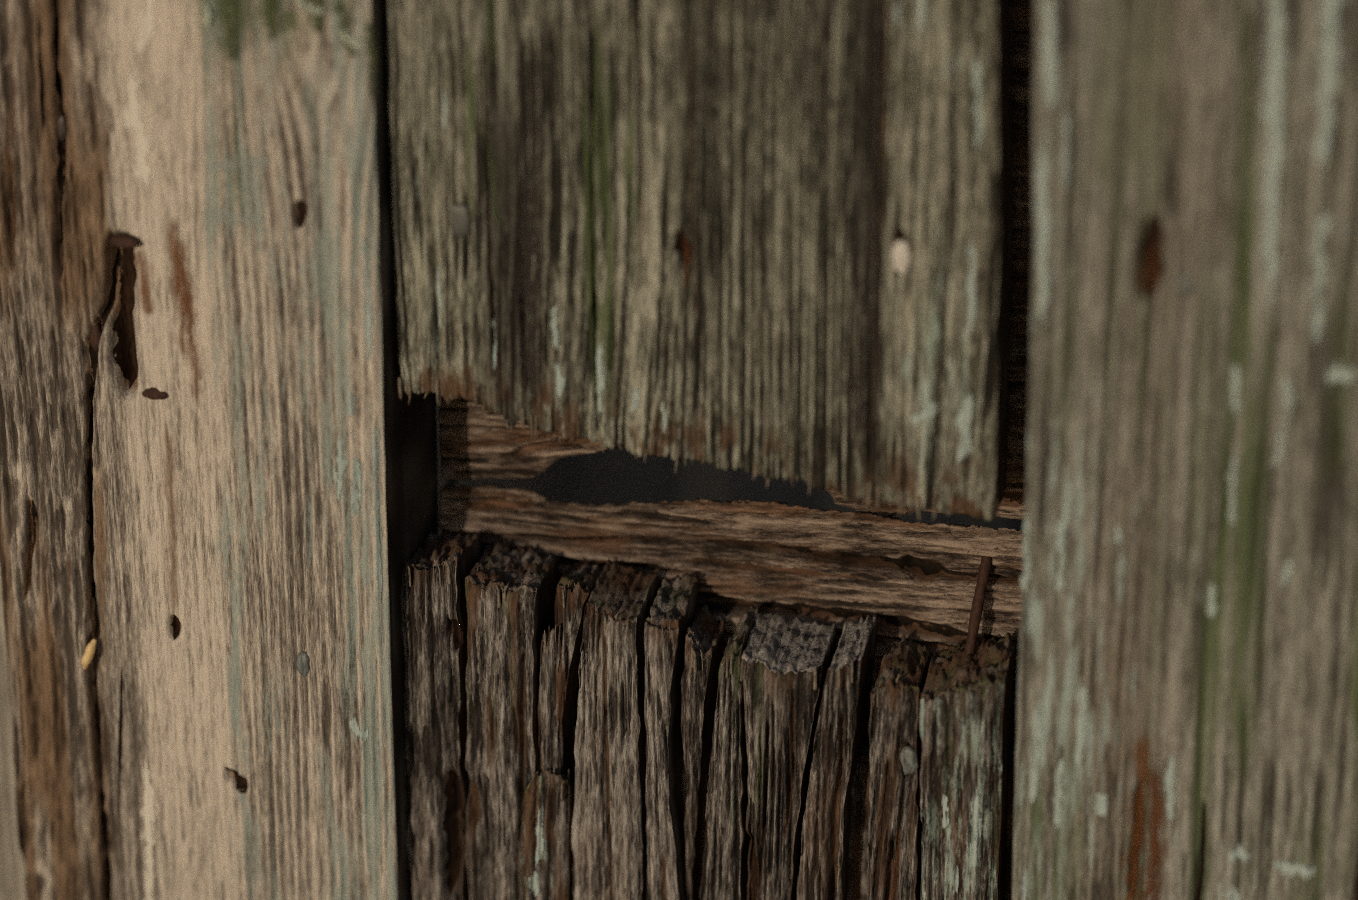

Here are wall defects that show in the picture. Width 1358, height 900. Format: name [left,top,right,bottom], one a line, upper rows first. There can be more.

crack [37,0,67,276]
rust [138,251,151,313]
rust [169,224,198,398]
rust [1123,743,1148,900]